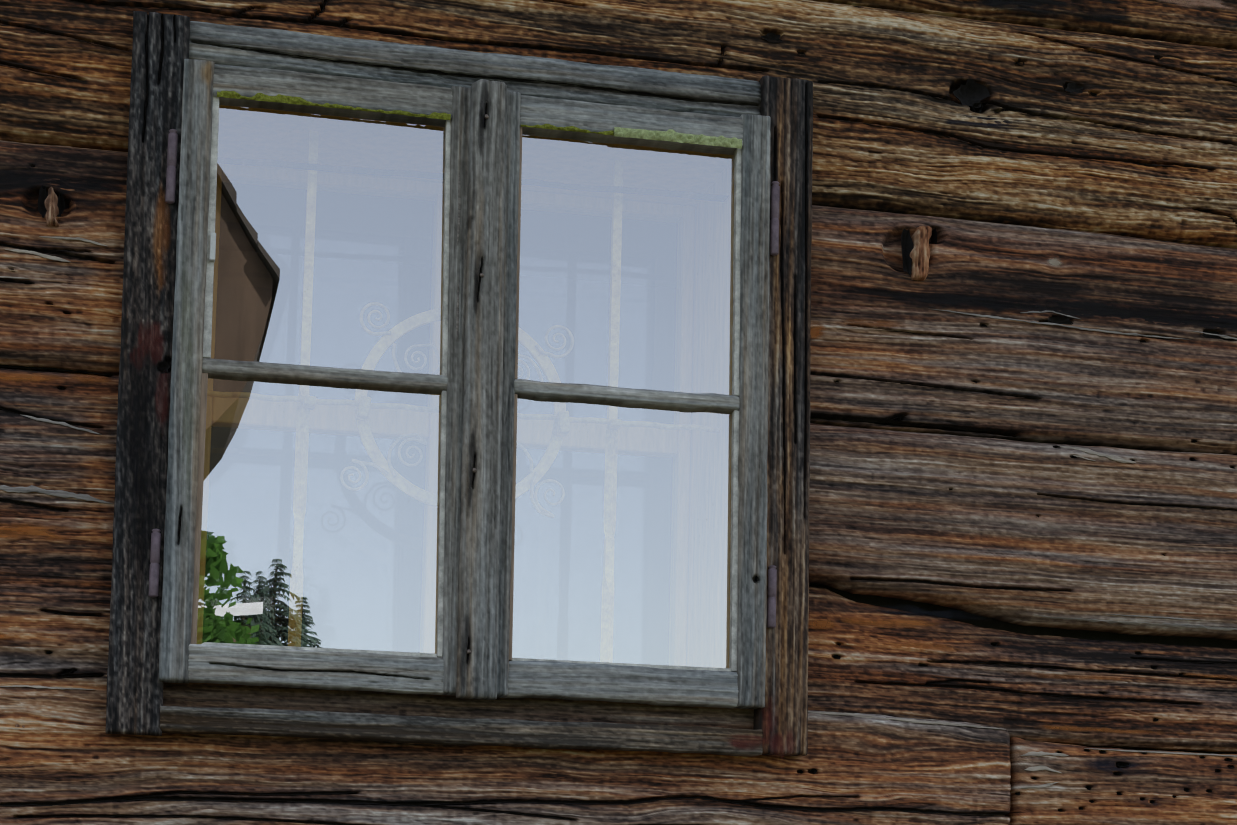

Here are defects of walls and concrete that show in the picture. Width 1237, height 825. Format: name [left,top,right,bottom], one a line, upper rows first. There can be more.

crack [69,0,756,137]
crack [0,499,62,511]
crack [0,791,1003,825]